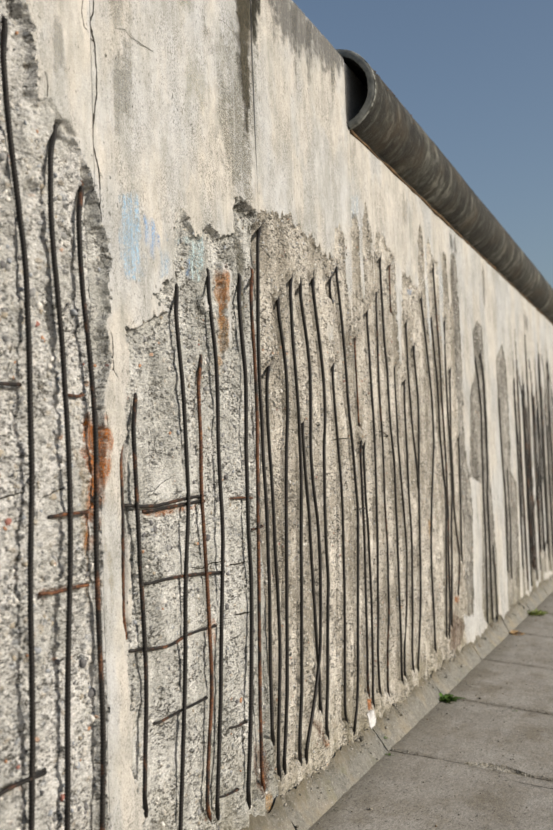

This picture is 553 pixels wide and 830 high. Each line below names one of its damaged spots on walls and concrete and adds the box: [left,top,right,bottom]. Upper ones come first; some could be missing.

crack [82,0,102,223]
water stain [219,0,344,213]
spalling [0,0,113,830]
rust [83,414,113,549]
spalling [120,191,553,830]